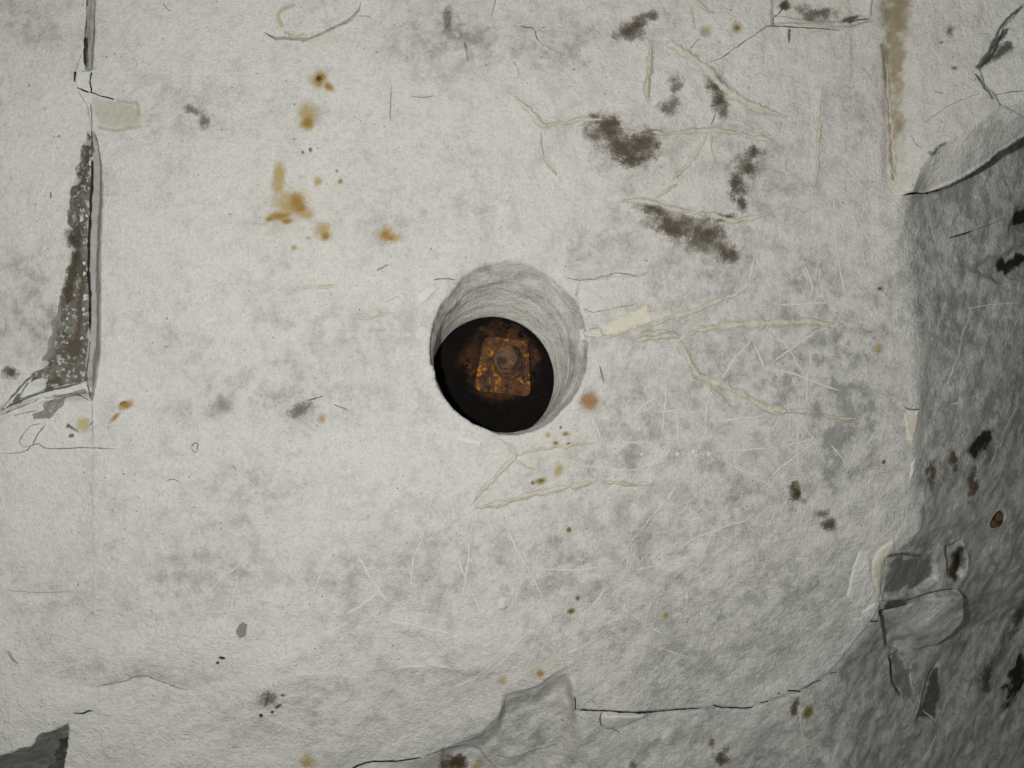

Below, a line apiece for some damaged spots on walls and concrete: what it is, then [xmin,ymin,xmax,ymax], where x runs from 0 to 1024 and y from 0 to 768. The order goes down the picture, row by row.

spalling [76,0,96,88]
damp [613,10,656,40]
corrosion [314,72,333,91]
corrosion [300,105,315,128]
damp [585,115,661,167]
corrosion [267,165,311,224]
damp [643,145,761,263]
spalling [2,132,103,419]
damp [949,430,992,503]
peeling [846,552,879,620]
crack [574,672,836,733]
spalling [918,668,939,718]